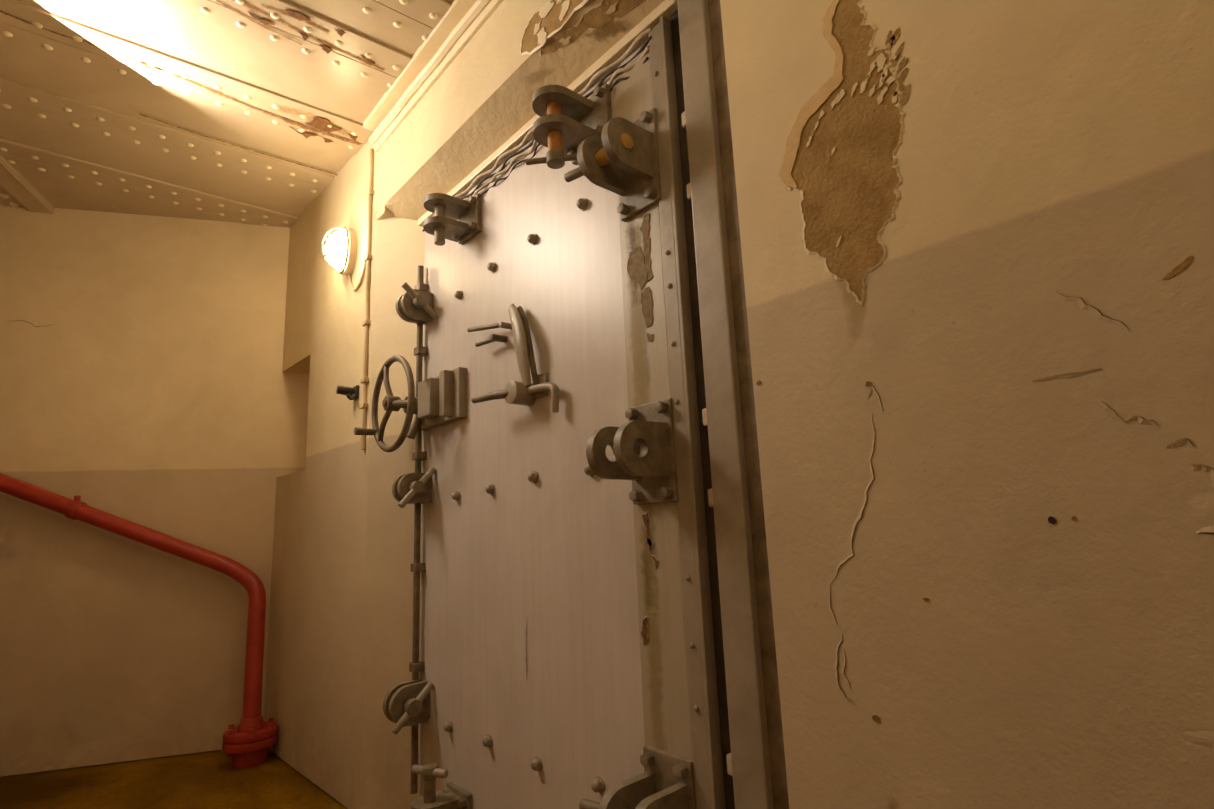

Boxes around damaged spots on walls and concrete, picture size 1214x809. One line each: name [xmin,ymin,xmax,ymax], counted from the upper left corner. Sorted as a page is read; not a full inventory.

peeling [520,0,650,56]
peeling [779,0,910,307]
crack [1032,368,1214,488]
crack [828,383,883,707]
crack [1196,525,1214,535]